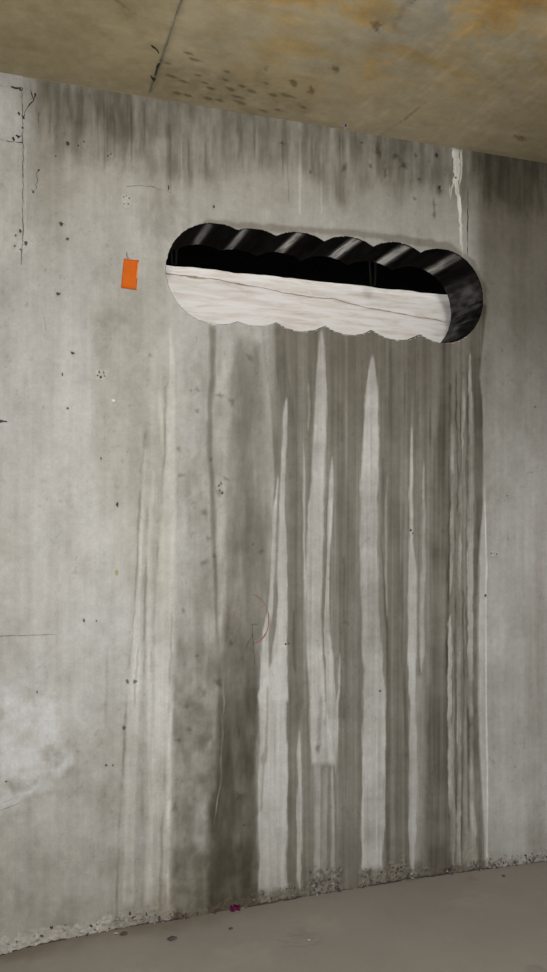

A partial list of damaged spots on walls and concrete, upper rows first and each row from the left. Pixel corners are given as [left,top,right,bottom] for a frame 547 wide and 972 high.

damp [11,50,458,225]
damp [114,147,547,914]